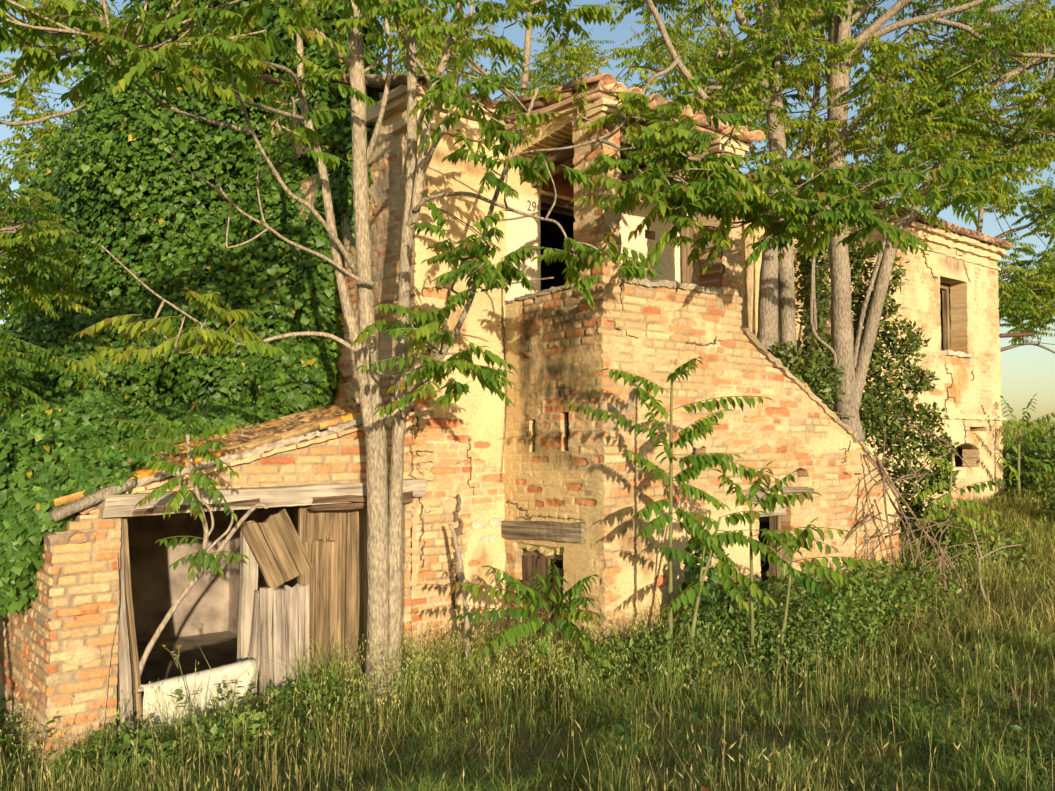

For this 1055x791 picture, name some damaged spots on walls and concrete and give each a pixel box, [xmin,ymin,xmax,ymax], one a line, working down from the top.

crack [919,240,938,279]
crack [944,363,977,445]
spalling [414,416,459,444]
spalling [474,440,492,449]
crack [412,416,475,609]
crack [506,500,581,520]